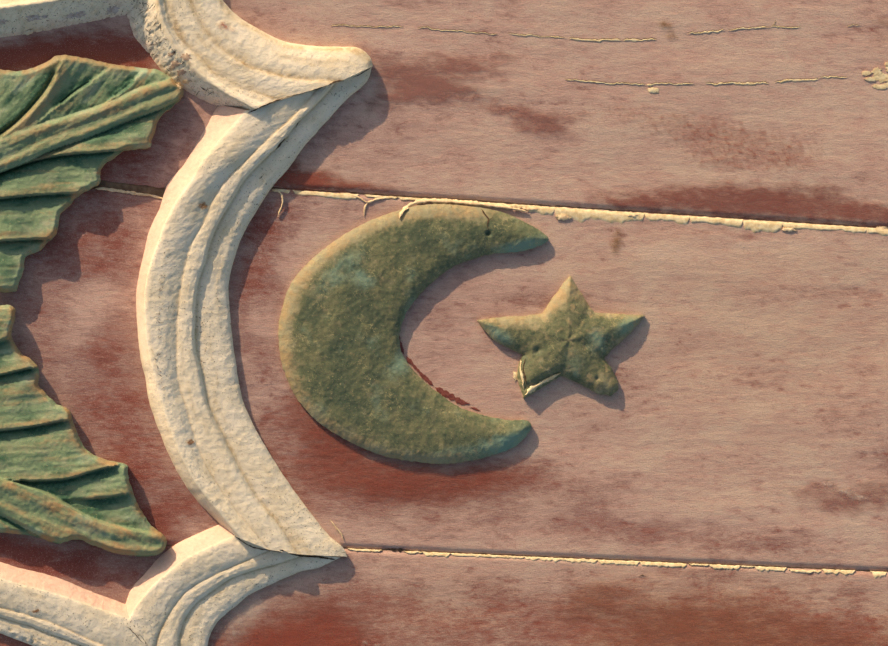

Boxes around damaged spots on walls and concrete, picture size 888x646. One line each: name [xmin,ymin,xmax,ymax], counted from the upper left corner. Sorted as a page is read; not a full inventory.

crack [331,24,657,42]
crack [688,22,799,34]
crack [568,75,847,93]
peeling [862,62,888,89]
peeling [271,189,428,201]
peeling [447,202,888,236]
peeling [405,551,855,576]